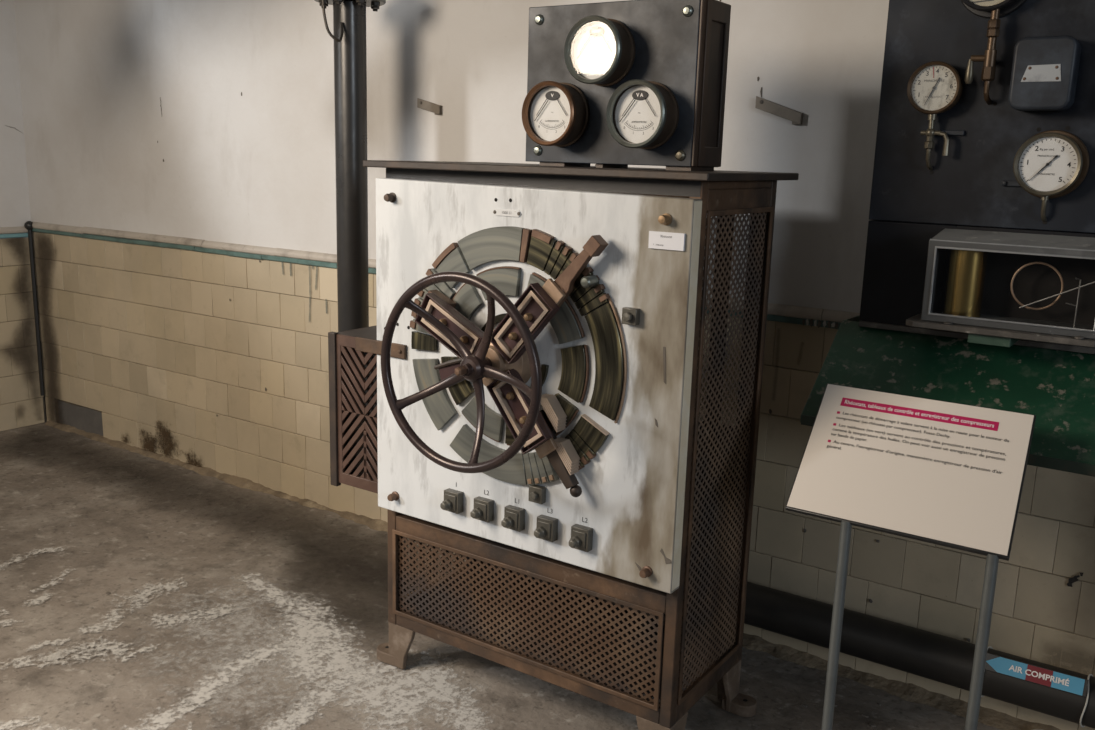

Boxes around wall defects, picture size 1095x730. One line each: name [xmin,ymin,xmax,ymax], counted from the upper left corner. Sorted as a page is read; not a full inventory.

leakage [7,236,60,423]
leakage [141,421,203,468]
leakage [0,547,64,570]
leakage [0,568,493,730]